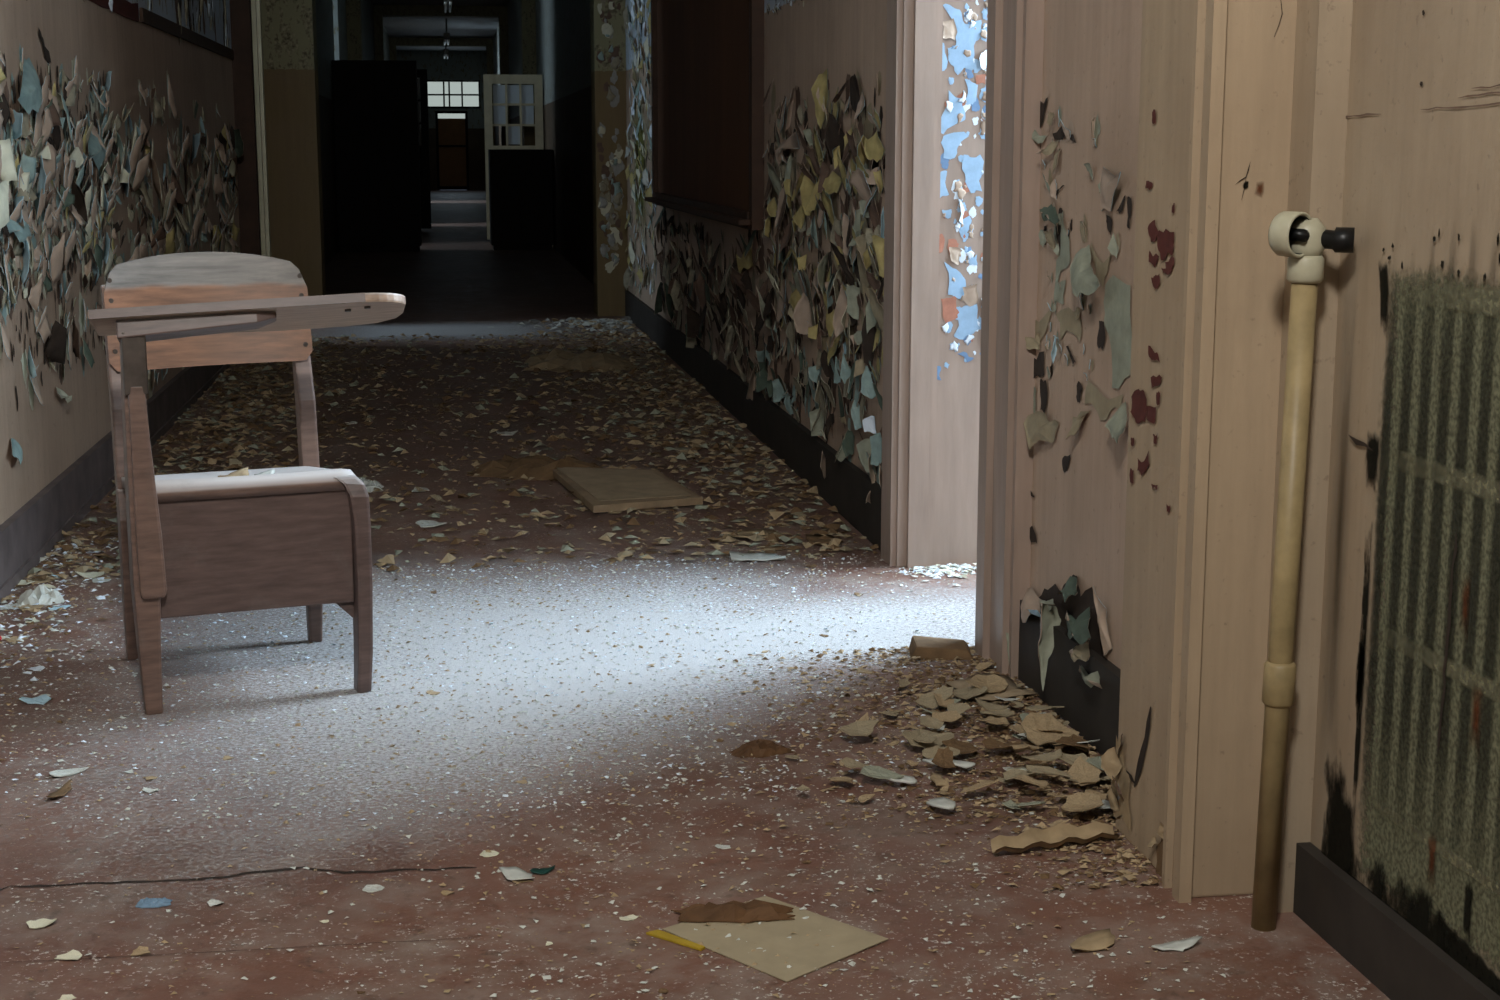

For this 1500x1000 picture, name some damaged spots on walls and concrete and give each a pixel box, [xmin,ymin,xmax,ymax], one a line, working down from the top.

peeling [11,438,23,465]
peeling [0,27,244,411]
peeling [84,0,231,49]
peeling [596,0,885,504]
peeling [937,0,988,380]
peeling [1006,575,1113,690]
peeling [1023,97,1132,472]